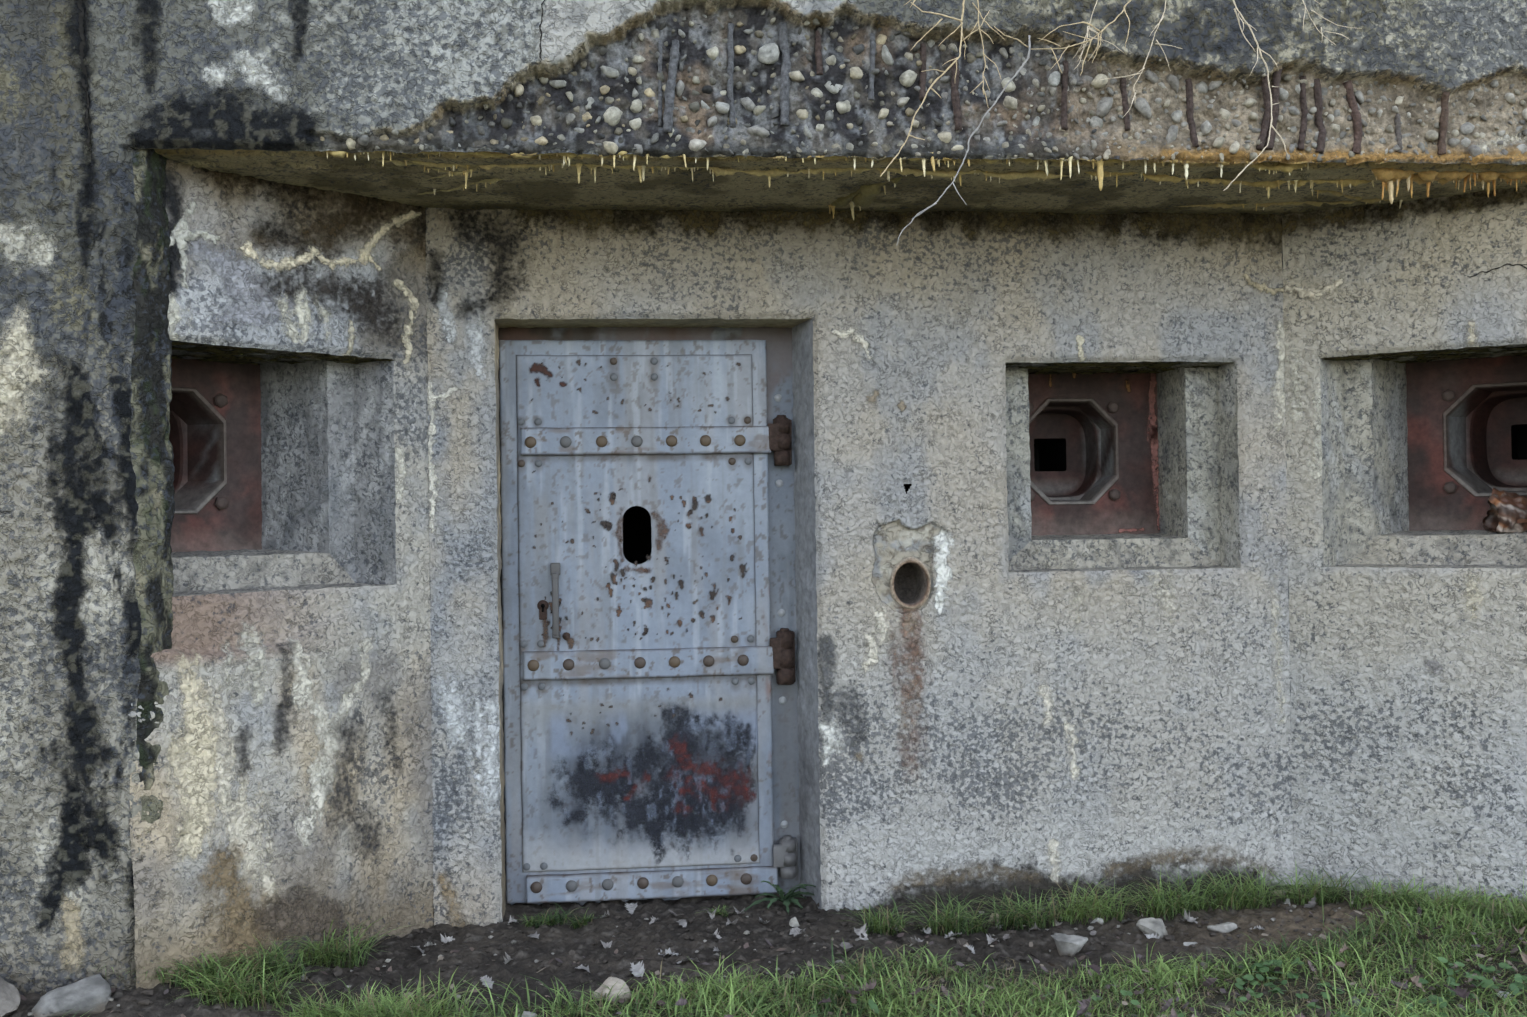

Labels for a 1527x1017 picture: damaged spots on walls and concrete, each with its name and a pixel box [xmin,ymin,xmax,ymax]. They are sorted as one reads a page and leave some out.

spalling [312,0,1527,166]
rust [1162,149,1527,166]
water stain [198,151,1527,380]
crack [1467,264,1527,277]
crack [169,201,458,533]
rust [530,360,602,401]
water stain [0,311,141,969]
water stain [167,623,380,972]
water stain [438,678,501,813]
rust [542,488,747,650]
spalling [872,519,944,613]
rust [893,606,923,762]